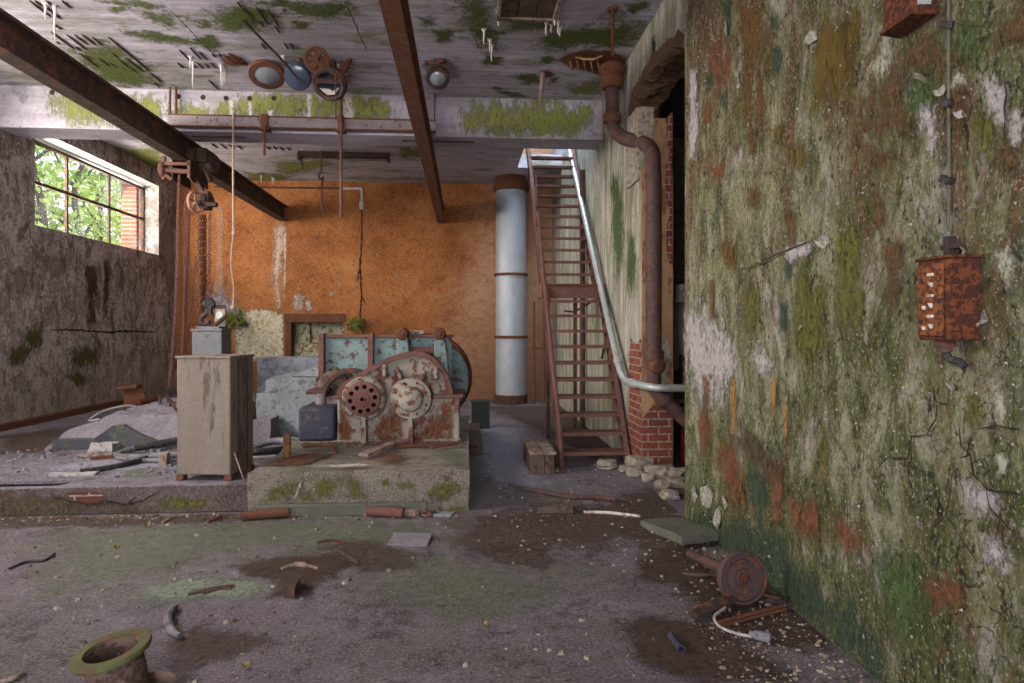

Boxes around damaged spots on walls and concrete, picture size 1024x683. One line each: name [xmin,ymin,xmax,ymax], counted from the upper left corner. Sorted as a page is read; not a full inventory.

spalling [541,50,625,77]
spalling [628,1,852,267]
efflorescence [271,224,287,310]
crack [52,327,154,335]
rust [697,375,754,516]
rust [768,460,825,541]
crack [875,386,1020,564]